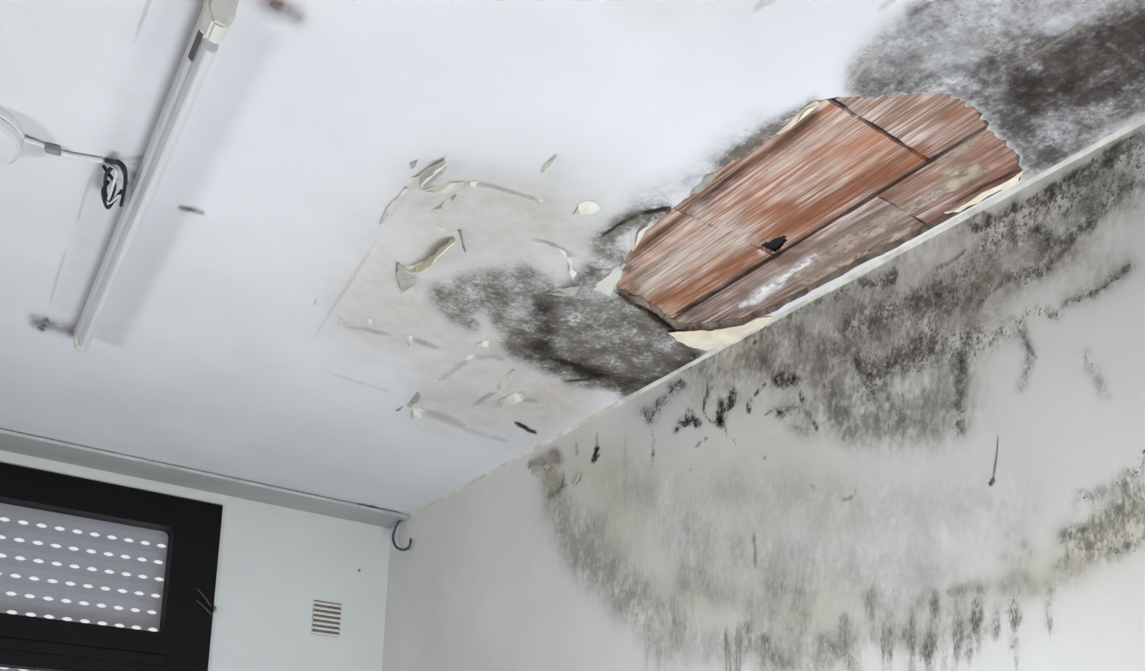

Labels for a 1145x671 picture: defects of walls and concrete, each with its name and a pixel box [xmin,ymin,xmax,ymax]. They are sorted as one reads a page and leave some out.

peeling [379,160,478,295]
peeling [547,248,580,297]
damp [431,0,1145,439]
flaking render [594,93,1025,350]
damp [552,494,658,611]
damp [1055,450,1145,568]